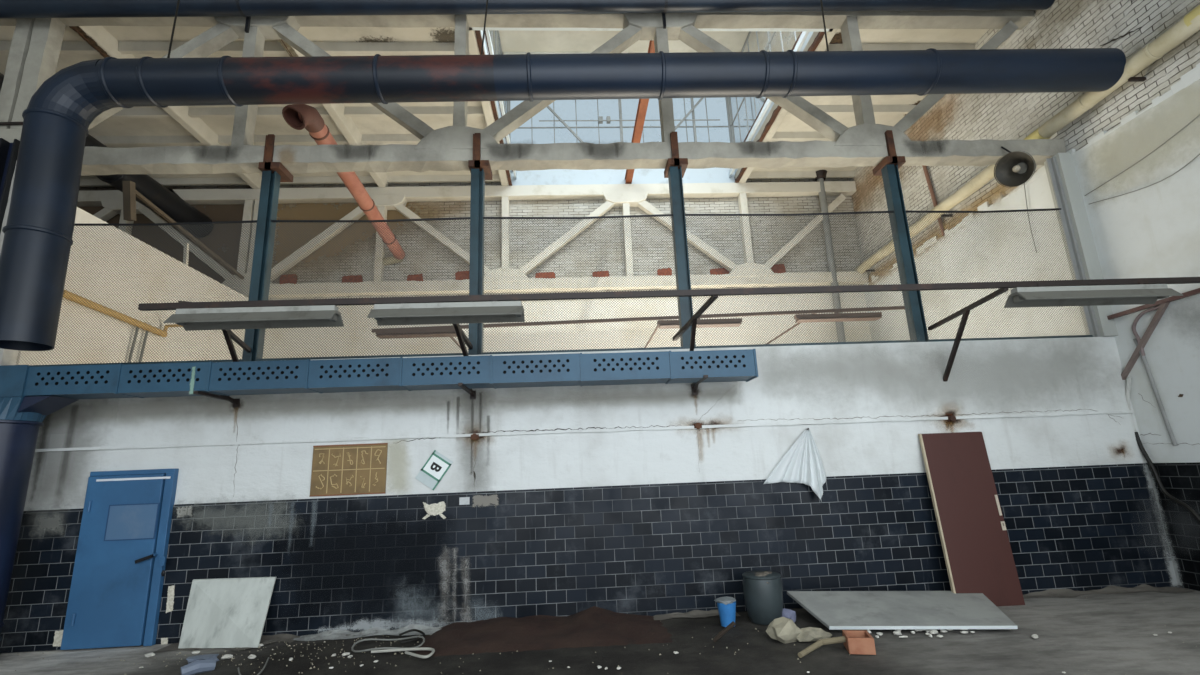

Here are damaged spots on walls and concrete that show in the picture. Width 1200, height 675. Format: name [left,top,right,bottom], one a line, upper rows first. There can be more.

damp [1144,465,1182,586]
damp [293,549,471,641]